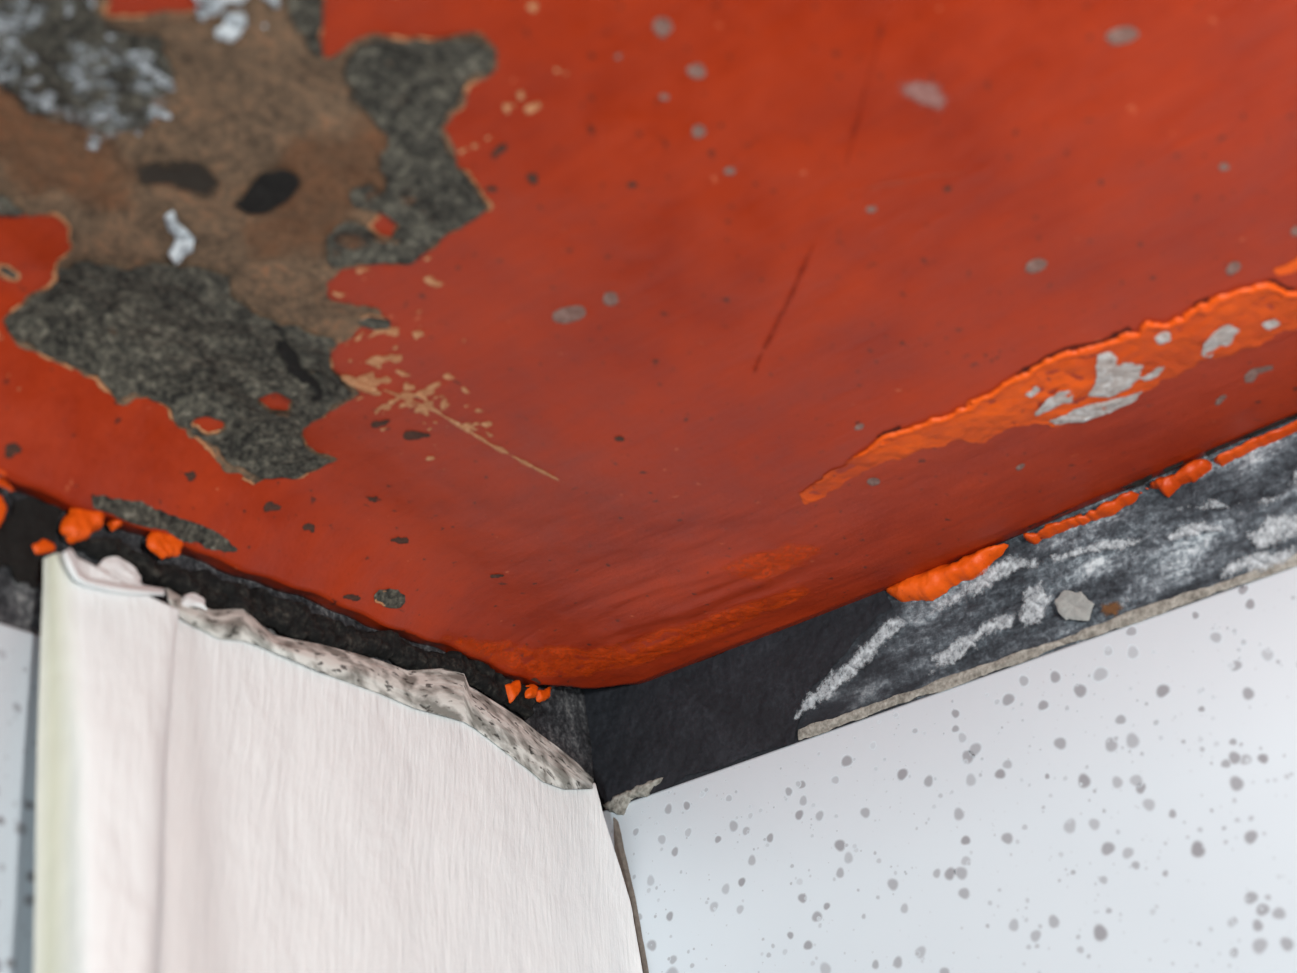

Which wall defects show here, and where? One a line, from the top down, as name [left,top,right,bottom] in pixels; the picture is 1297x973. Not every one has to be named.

peeling [0,0,498,485]
peeling [799,258,1297,505]
spalling [0,443,62,589]
peeling [343,589,405,609]
peeling [456,588,805,684]
water stain [938,558,1036,607]
water stain [932,586,1051,665]
water stain [1053,539,1138,560]
water stain [1168,501,1222,540]
water stain [583,591,904,804]